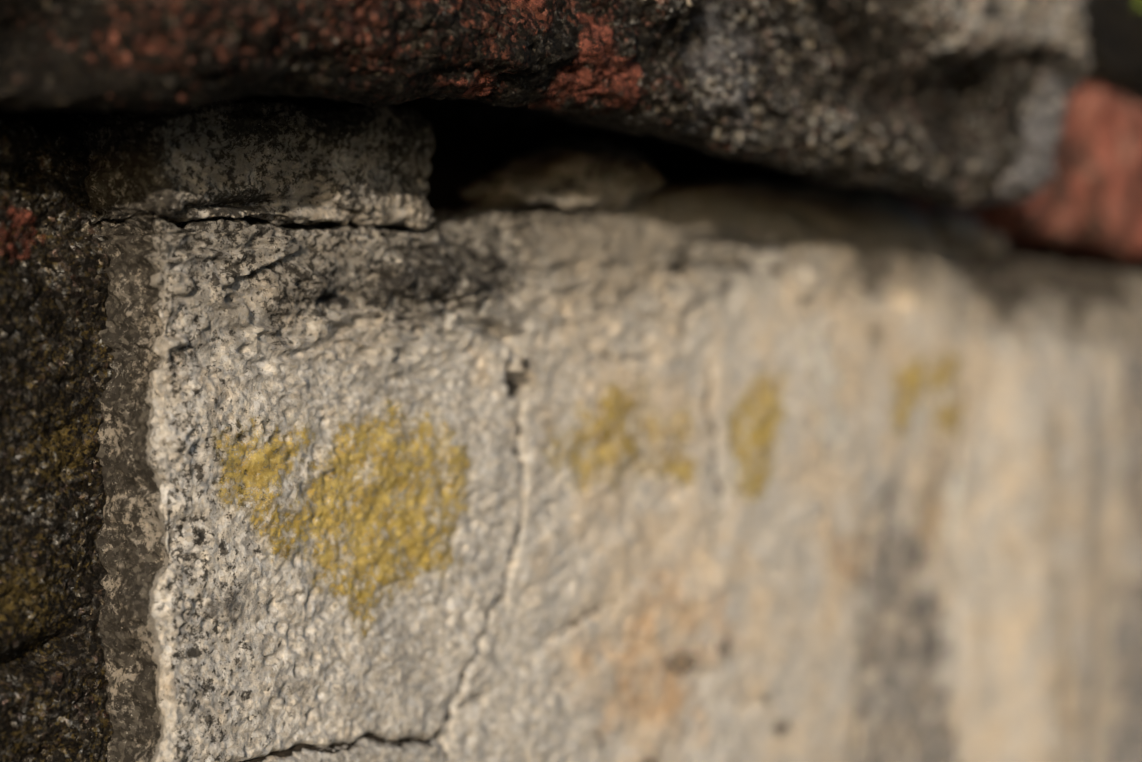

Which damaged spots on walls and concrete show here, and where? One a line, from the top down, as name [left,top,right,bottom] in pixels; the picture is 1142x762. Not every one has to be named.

crack [238,418,524,762]